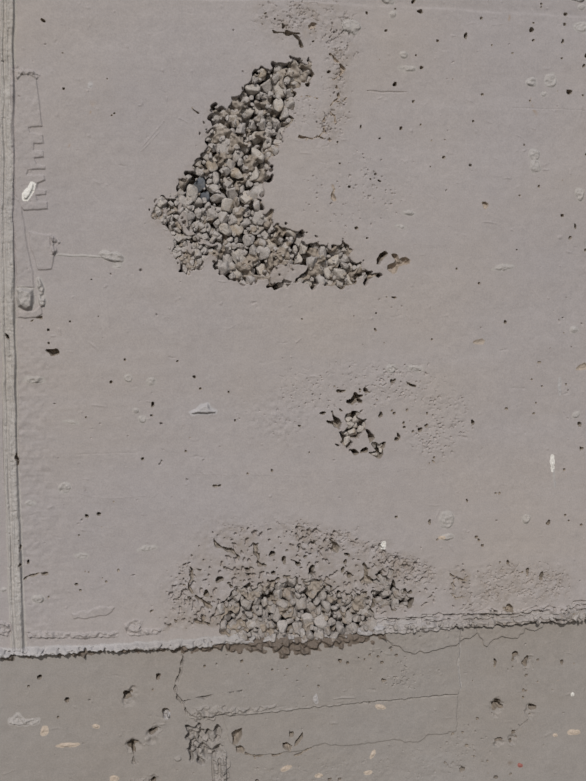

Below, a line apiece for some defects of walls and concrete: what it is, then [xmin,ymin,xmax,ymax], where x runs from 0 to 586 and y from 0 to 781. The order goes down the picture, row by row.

spalling [141,0,432,328]
peeling [189,402,218,416]
spalling [228,342,481,476]
spalling [122,508,583,638]
peeling [476,622,545,648]
spalling [119,685,140,709]
spalling [122,721,163,755]
crack [173,654,243,716]
crack [245,747,312,760]
peeling [175,636,518,781]